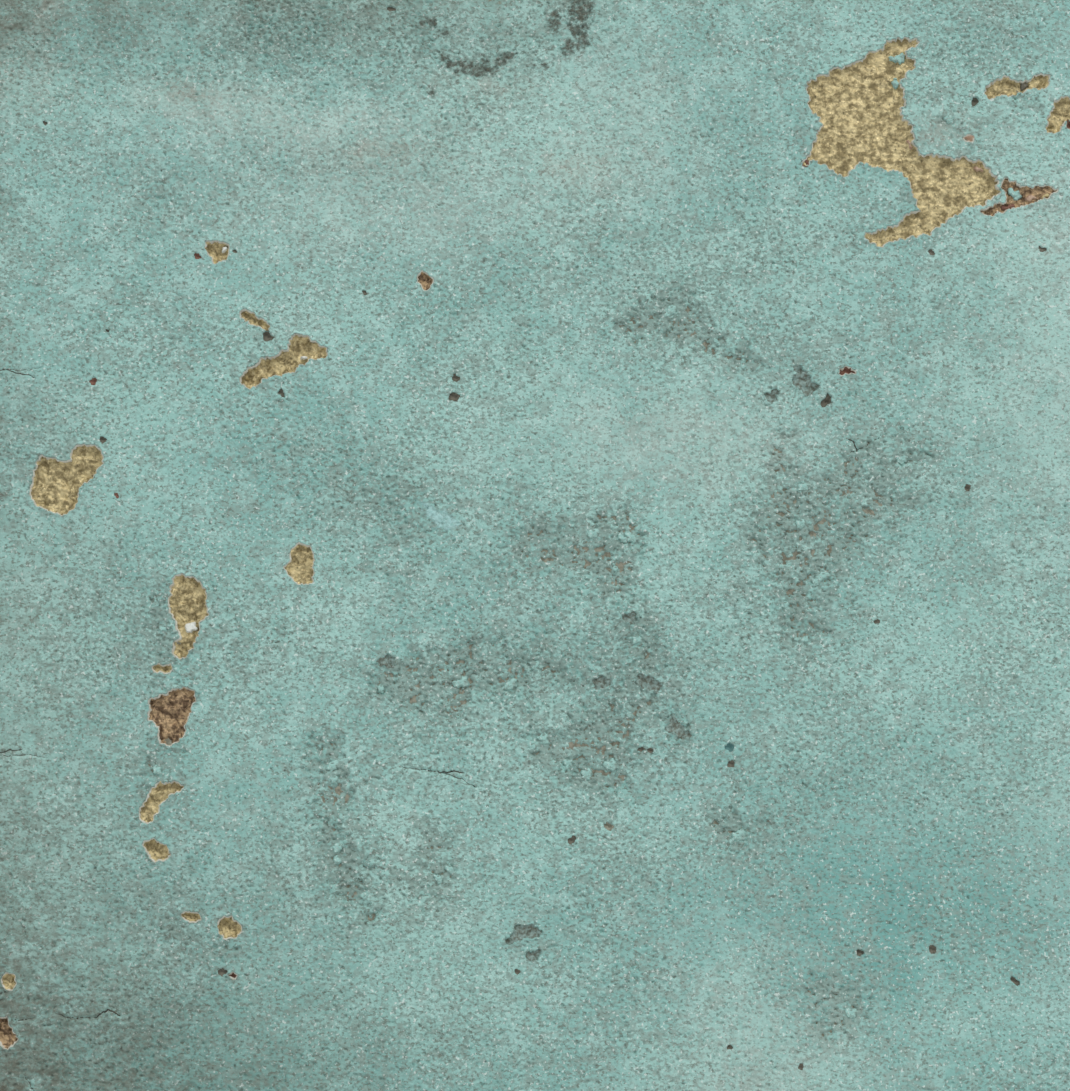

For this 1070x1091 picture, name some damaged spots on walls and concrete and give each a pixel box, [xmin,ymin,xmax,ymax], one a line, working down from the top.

spalling [801,37,1058,248]
spalling [1045,96,1070,134]
spalling [240,309,274,342]
spalling [240,333,328,397]
spalling [29,437,107,516]
spalling [152,573,209,674]
spalling [147,686,197,746]